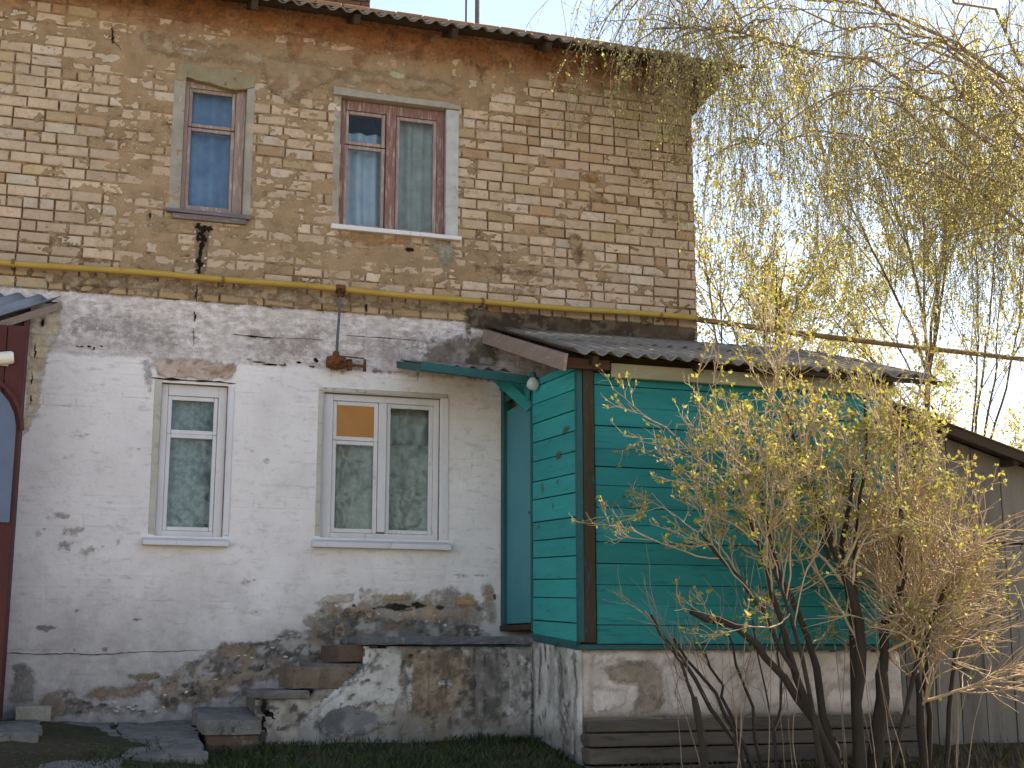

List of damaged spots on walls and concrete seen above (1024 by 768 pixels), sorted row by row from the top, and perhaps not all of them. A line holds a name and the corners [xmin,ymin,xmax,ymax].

spalling [569,234,583,265]
peeling [22,301,326,435]
peeling [57,513,84,549]
crack [10,625,201,655]
spalling [42,585,496,718]
peeling [591,687,627,712]
peeling [666,672,687,710]